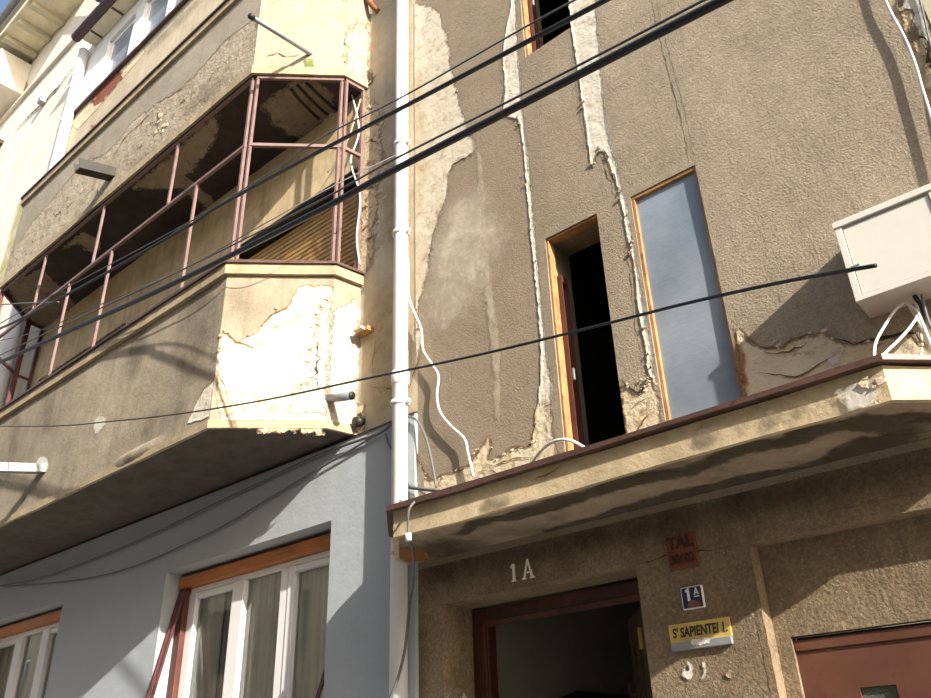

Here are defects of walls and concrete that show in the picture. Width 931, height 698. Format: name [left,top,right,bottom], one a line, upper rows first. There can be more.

peeling [900,0,931,101]
spalling [343,0,388,280]
peeling [408,0,559,497]
peeling [569,0,663,434]
peeling [187,284,366,436]
peeling [733,317,931,397]
spalling [838,376,887,410]
water stain [425,413,931,579]